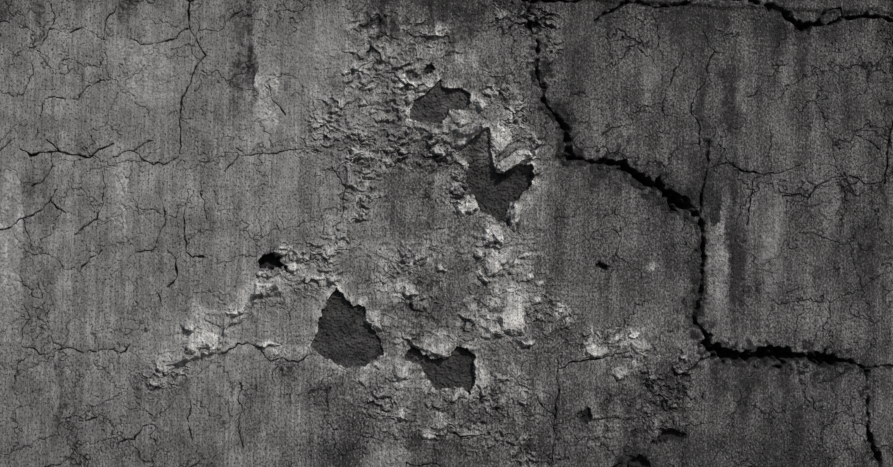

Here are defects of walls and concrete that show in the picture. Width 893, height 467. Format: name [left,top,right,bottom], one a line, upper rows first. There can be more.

crack [21,283,130,355]
crack [0,0,207,250]
crack [135,189,208,307]
flaking render [167,253,292,368]
crack [222,343,308,363]
crack [224,148,346,227]
spalling [304,281,544,402]
spalling [361,60,540,236]
flaking render [471,231,547,283]
crack [521,0,893,467]
spalling [580,407,593,426]
hole [626,427,688,467]